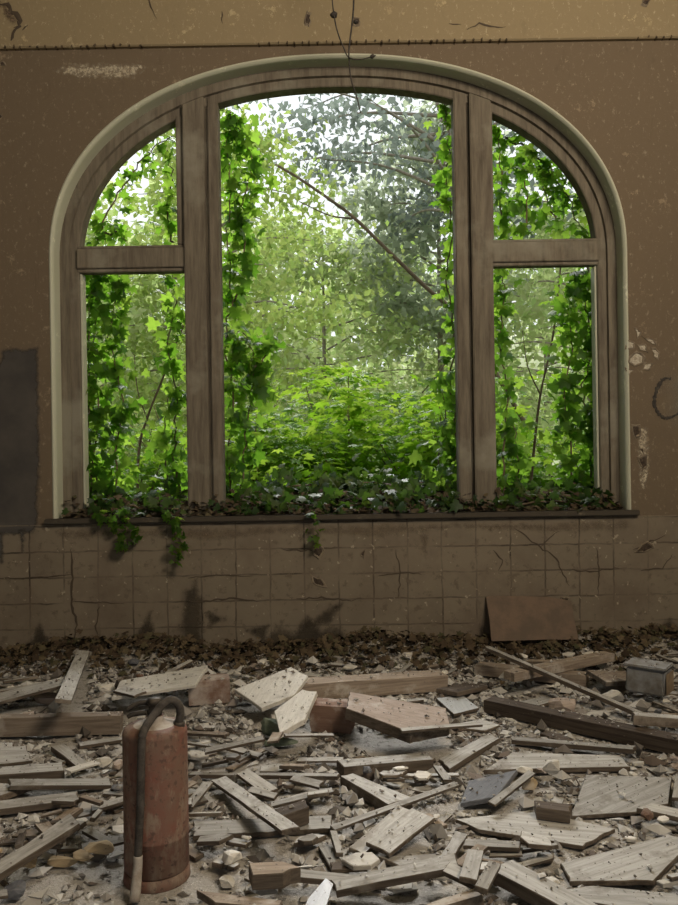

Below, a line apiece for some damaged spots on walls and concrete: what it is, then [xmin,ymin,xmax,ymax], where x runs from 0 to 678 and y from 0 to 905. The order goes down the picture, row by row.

crack [2,549,124,639]
crack [514,528,616,597]